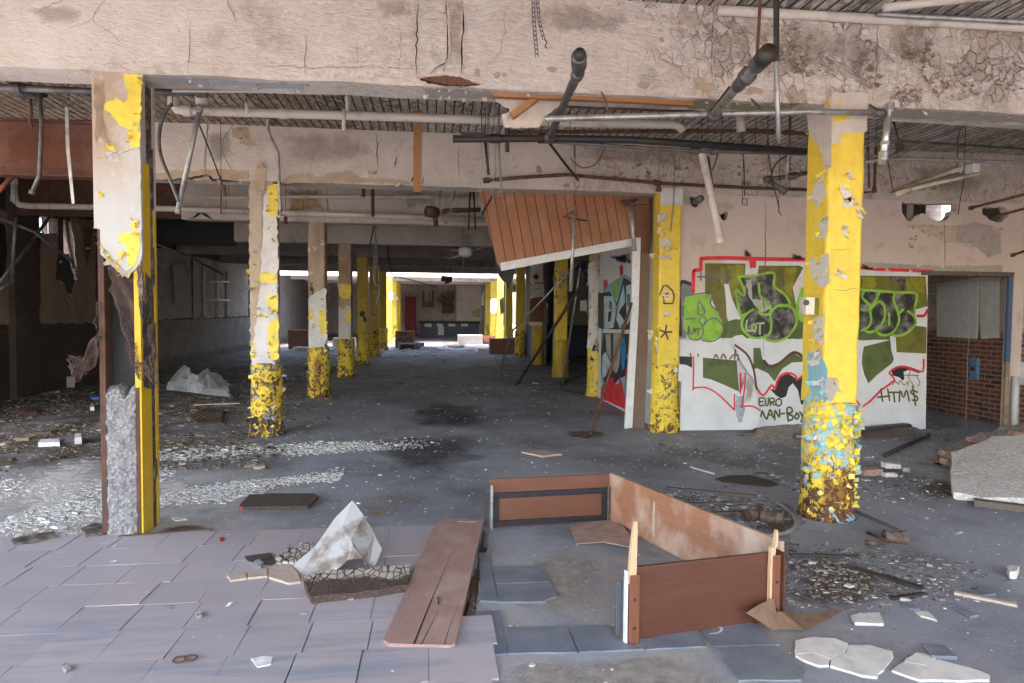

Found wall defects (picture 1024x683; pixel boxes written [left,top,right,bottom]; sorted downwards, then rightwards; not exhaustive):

crack [253,3,506,79]
crack [670,10,715,84]
peeling [86,220,140,278]
peeling [246,160,280,361]
peeling [649,212,682,270]
peeling [806,253,848,290]
peeling [306,278,399,373]
peeling [646,311,678,353]
peeling [247,374,287,437]
peeling [801,314,865,517]